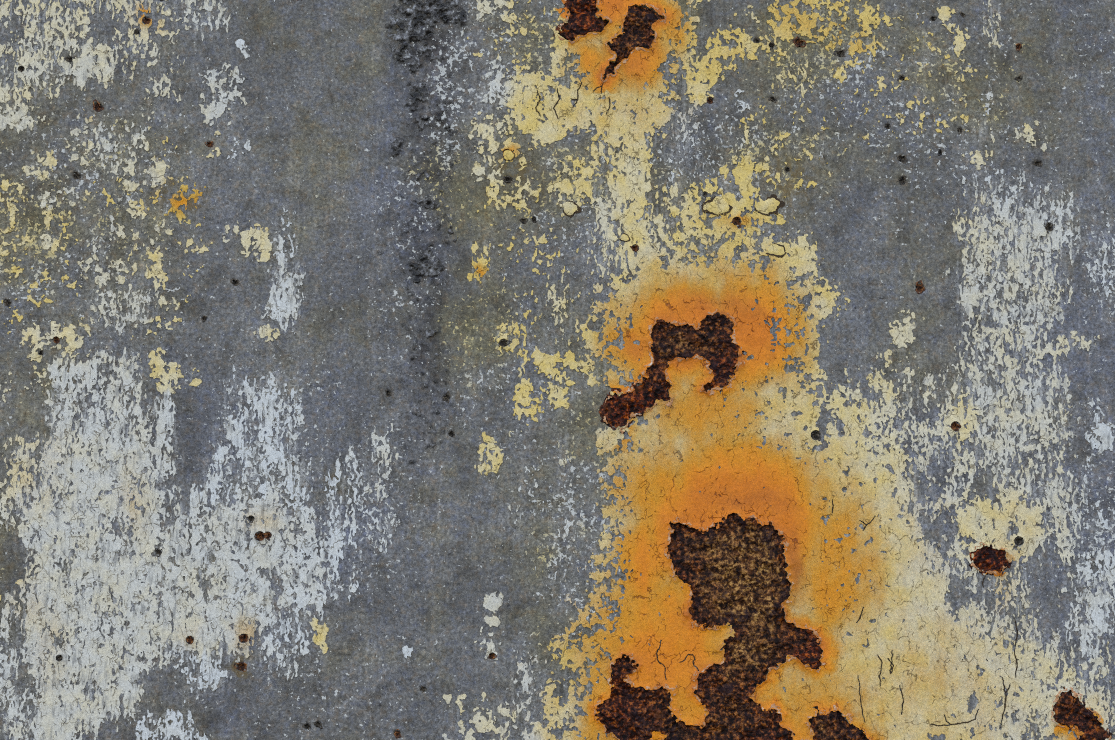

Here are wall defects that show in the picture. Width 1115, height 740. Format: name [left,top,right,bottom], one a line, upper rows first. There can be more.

corrosion [553,0,689,94]
peeling [0,0,399,740]
corrosion [574,265,887,740]
peeling [440,0,1115,740]
corrosion [969,542,1012,577]
corrosion [1051,687,1112,740]